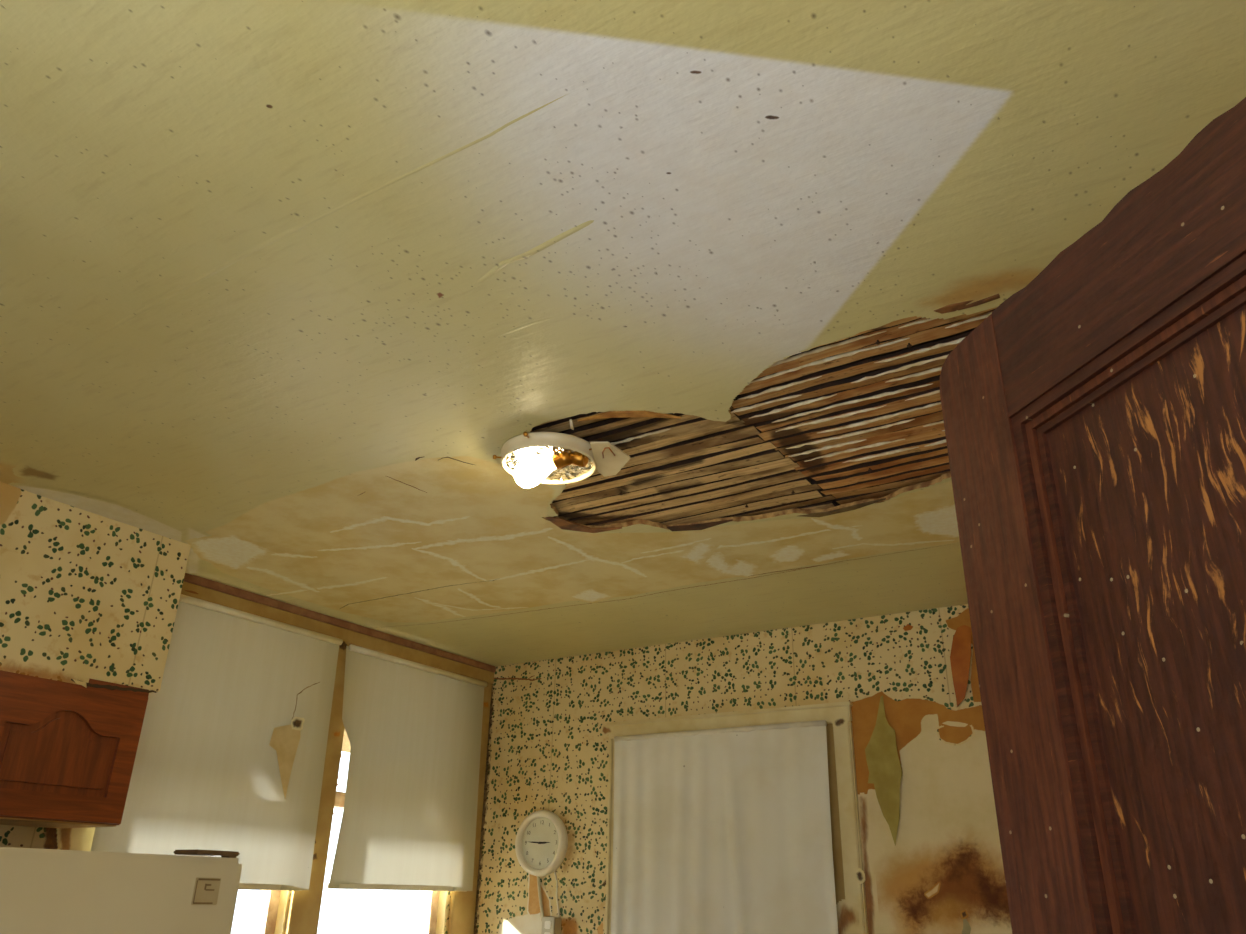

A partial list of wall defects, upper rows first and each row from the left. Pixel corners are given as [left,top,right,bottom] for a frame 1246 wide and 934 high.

crack [358,457,474,496]
peeling [185,294,1000,624]
peeling [950,625,971,707]
flaking render [864,696,998,851]
water stain [836,793,1012,934]